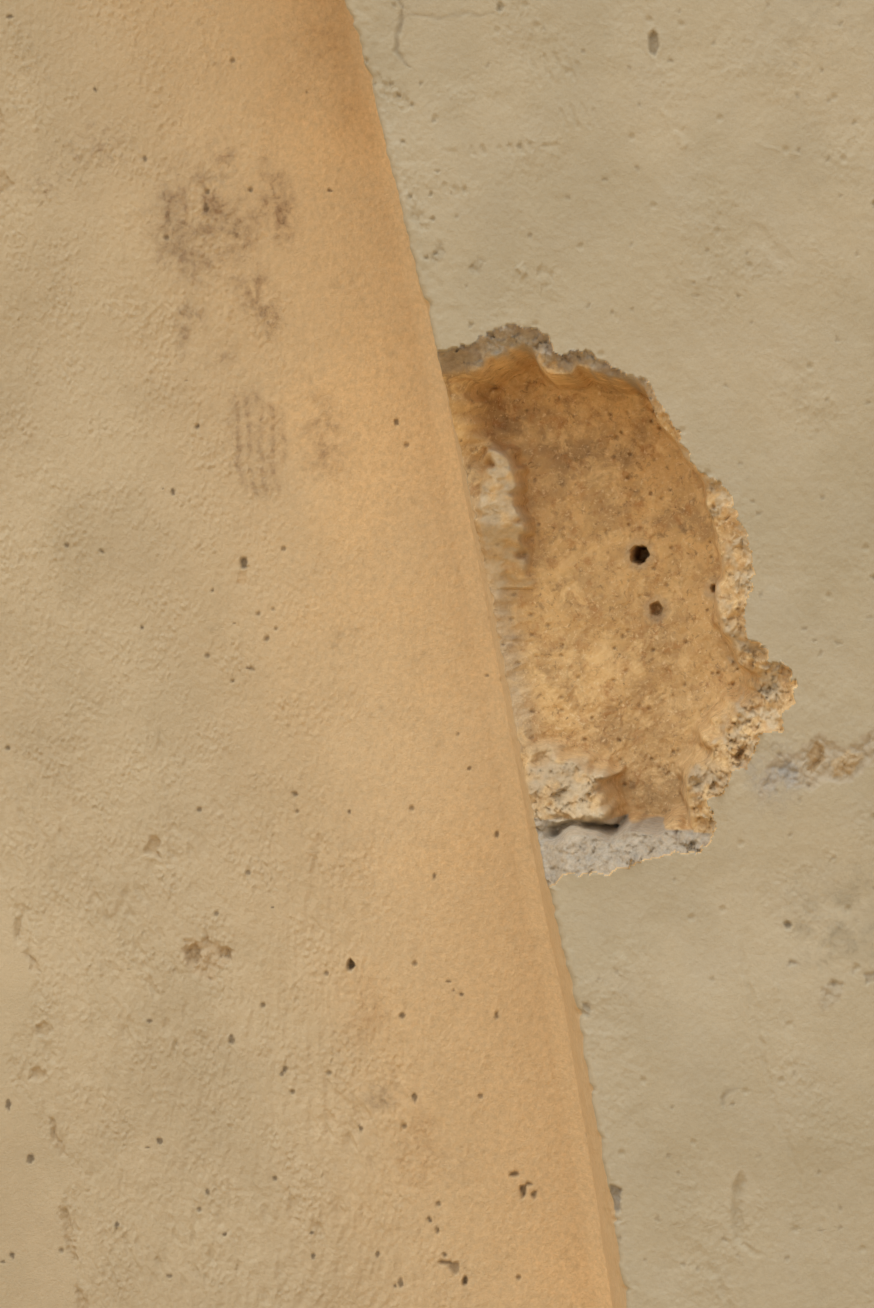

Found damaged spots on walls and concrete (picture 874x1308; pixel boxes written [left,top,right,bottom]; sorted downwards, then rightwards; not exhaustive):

flaking render [437,325,874,888]